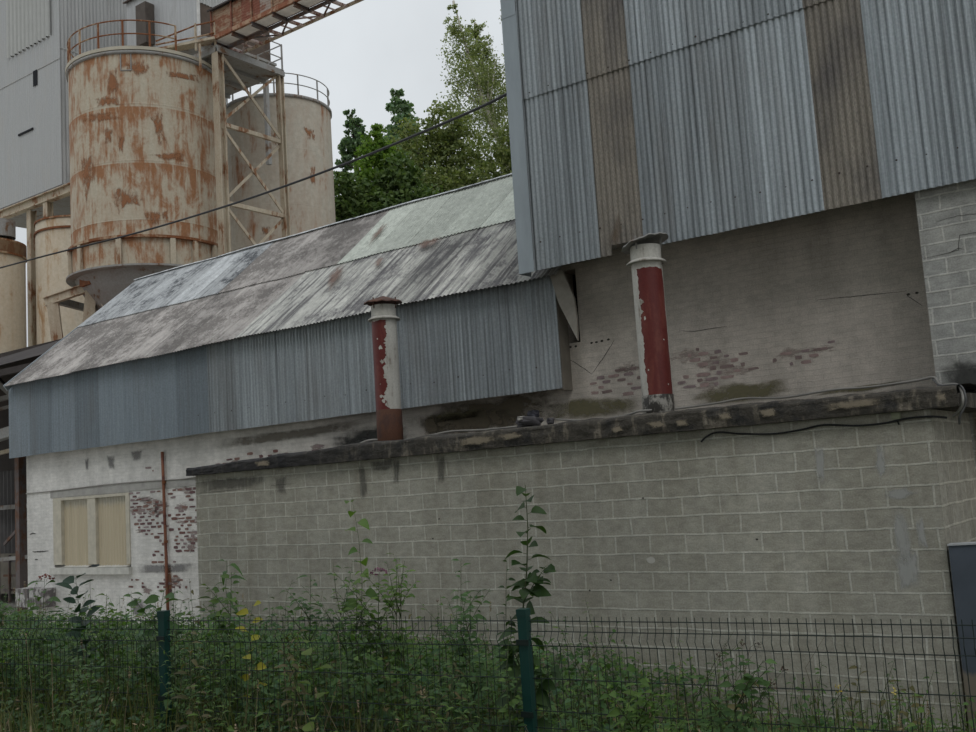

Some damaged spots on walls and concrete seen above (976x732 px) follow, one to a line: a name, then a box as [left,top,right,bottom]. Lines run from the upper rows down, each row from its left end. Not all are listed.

rust [84,62,148,152]
rust [151,114,183,161]
rust [82,157,94,201]
rust [114,188,139,208]
rust [145,211,168,223]
crack [923,214,976,259]
peeling [372,319,390,410]
peeling [590,266,759,396]
peeling [773,340,835,366]
damp [946,363,976,393]
peeling [129,487,197,564]
peeling [129,575,187,594]